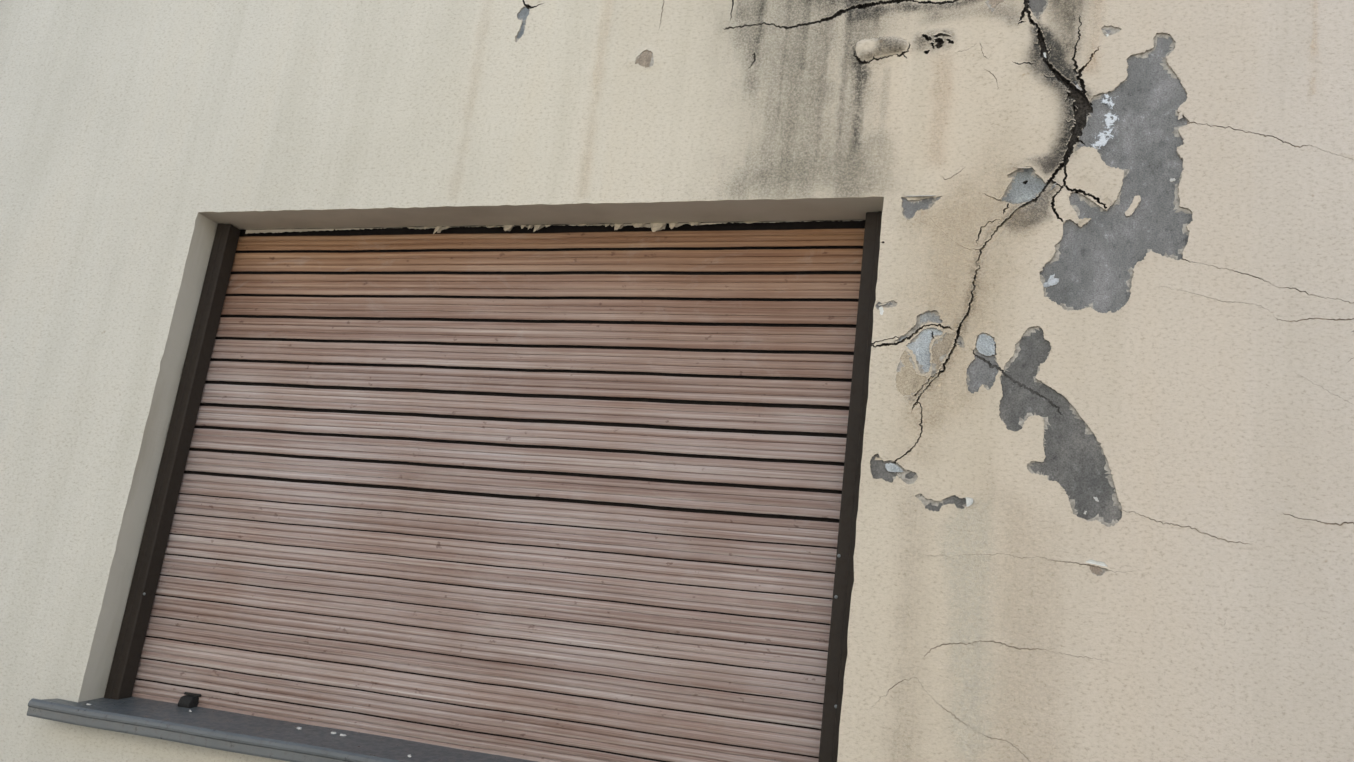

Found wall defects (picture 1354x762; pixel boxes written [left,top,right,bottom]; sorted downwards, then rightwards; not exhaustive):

crack [722,0,959,68]
crack [1187,122,1351,159]
peeling [901,195,942,220]
crack [872,0,1107,464]
peeling [1001,166,1046,205]
peeling [1039,32,1193,313]
peeling [895,310,955,396]
peeling [966,326,1122,527]
peeling [870,454,973,512]
crack [1123,510,1255,545]
crack [1284,514,1354,526]